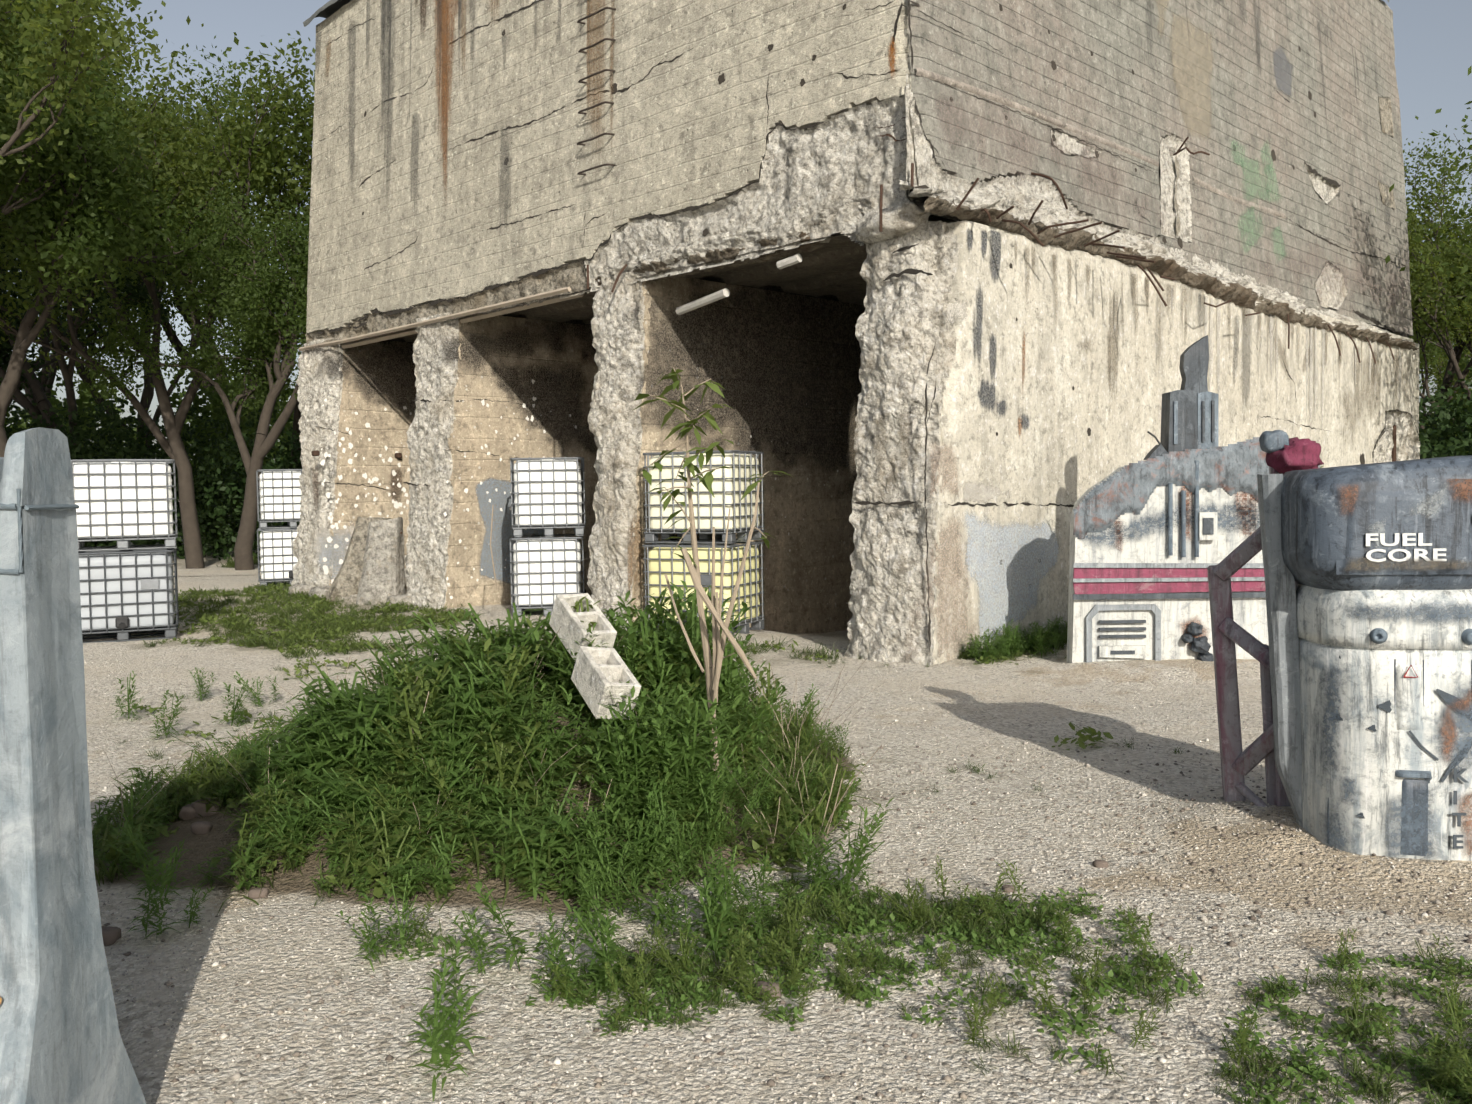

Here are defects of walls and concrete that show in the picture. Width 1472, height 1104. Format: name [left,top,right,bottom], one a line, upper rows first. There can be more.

corrosion [415,0,466,177]
crack [306,0,1156,335]
spalling [305,73,1183,346]
spalling [1173,136,1210,156]
spalling [1271,149,1340,204]
leakage [947,229,1029,429]
spalling [1314,263,1395,364]